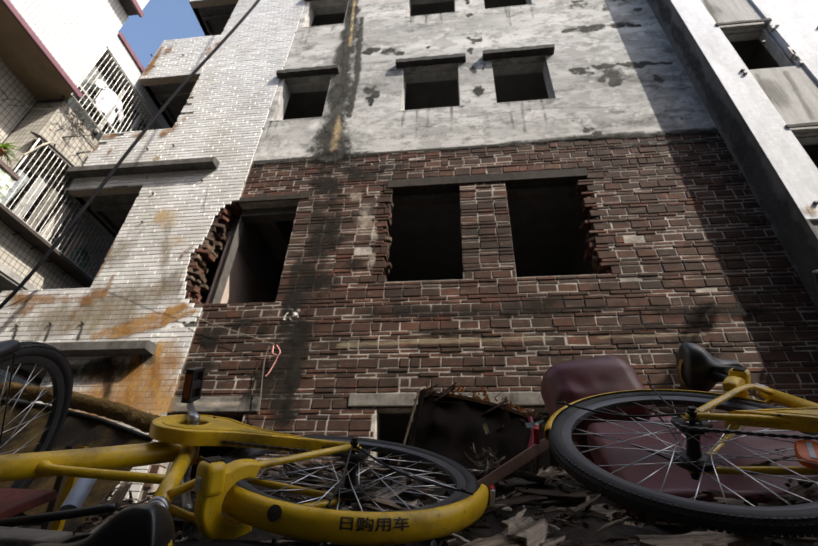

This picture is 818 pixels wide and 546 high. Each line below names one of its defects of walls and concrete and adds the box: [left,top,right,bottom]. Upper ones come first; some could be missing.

water stain [241,0,818,427]
spalling [184,203,242,308]
rust [6,293,66,315]
rust [79,275,114,304]
water stain [30,276,183,341]
rust [91,303,196,339]
water stain [71,341,215,417]